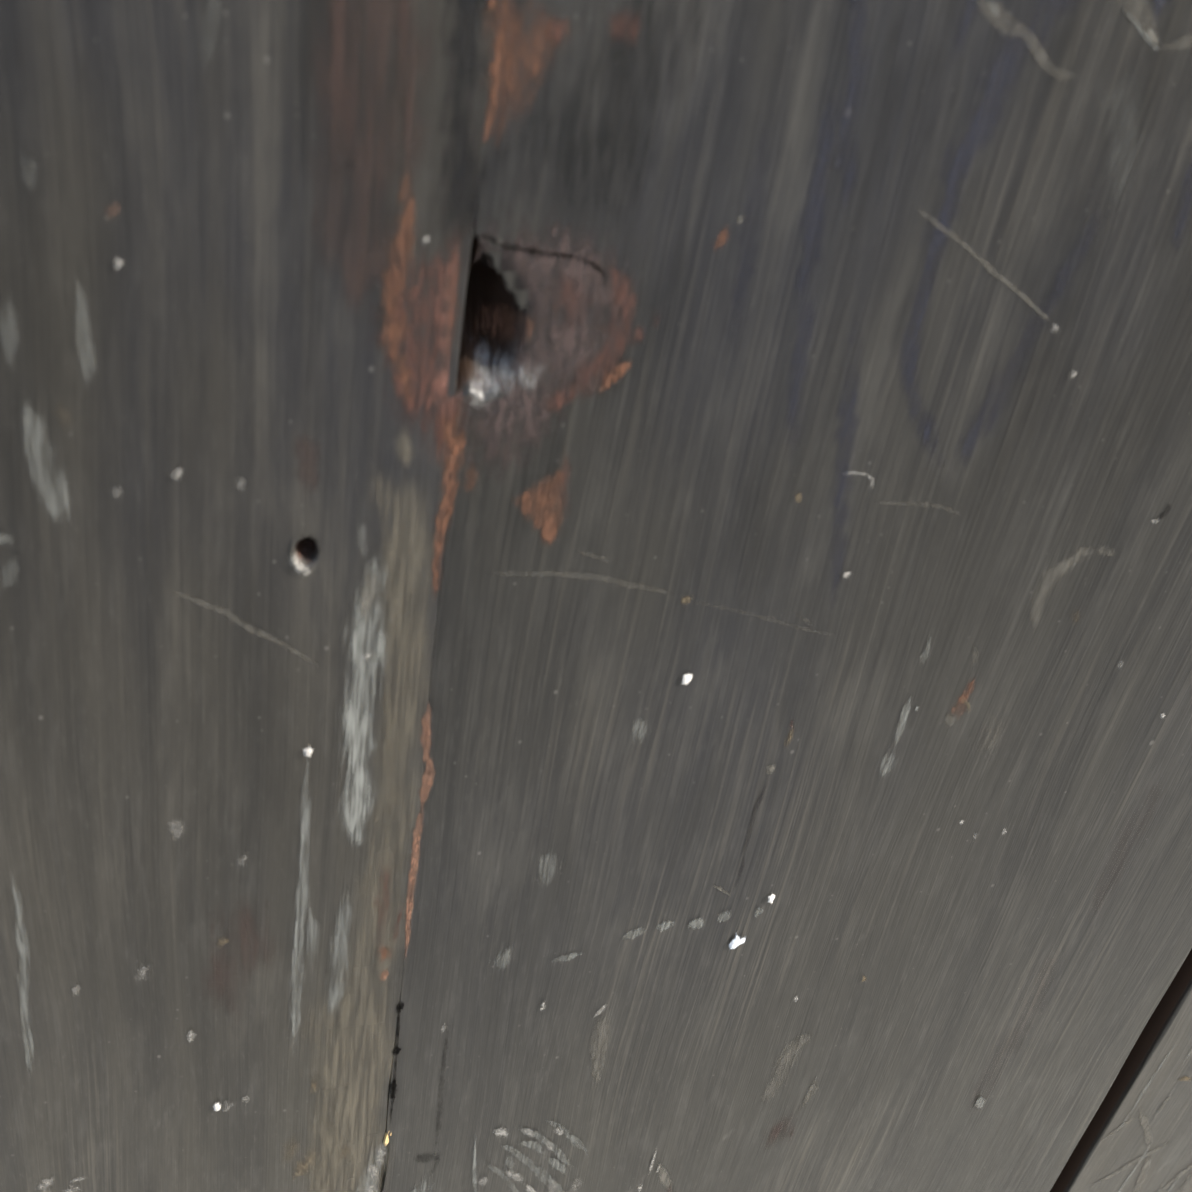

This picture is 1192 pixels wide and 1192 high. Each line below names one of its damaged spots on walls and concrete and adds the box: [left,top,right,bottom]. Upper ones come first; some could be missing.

corrosion [387,201,465,588]
crack [390,1003,404,1116]